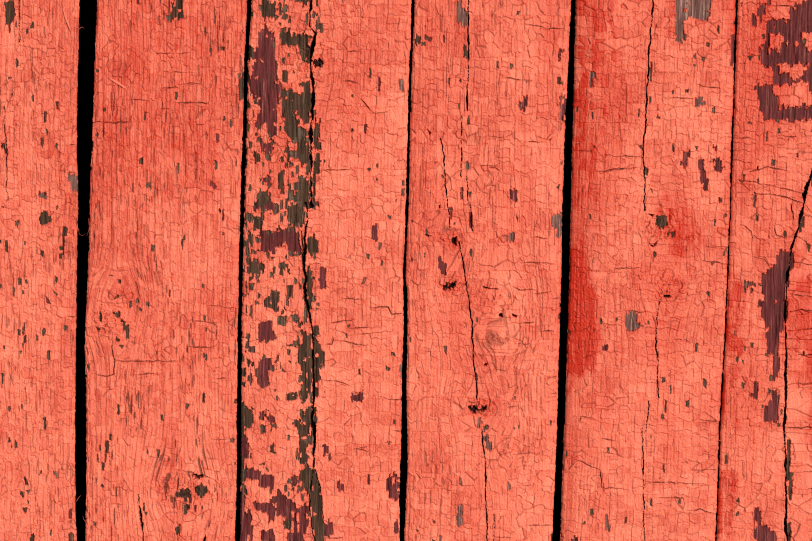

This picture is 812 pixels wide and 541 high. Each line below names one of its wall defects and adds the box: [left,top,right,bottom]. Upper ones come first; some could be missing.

crack [95,345,176,377]
peeling [232,0,334,313]
crack [302,0,403,541]
crack [440,0,498,400]
crack [481,431,511,541]
crack [597,0,654,211]
crack [576,299,718,539]
peeling [664,0,720,44]
peeling [751,507,776,541]
crack [735,159,812,541]
peeling [744,249,811,429]
peeling [751,0,812,123]